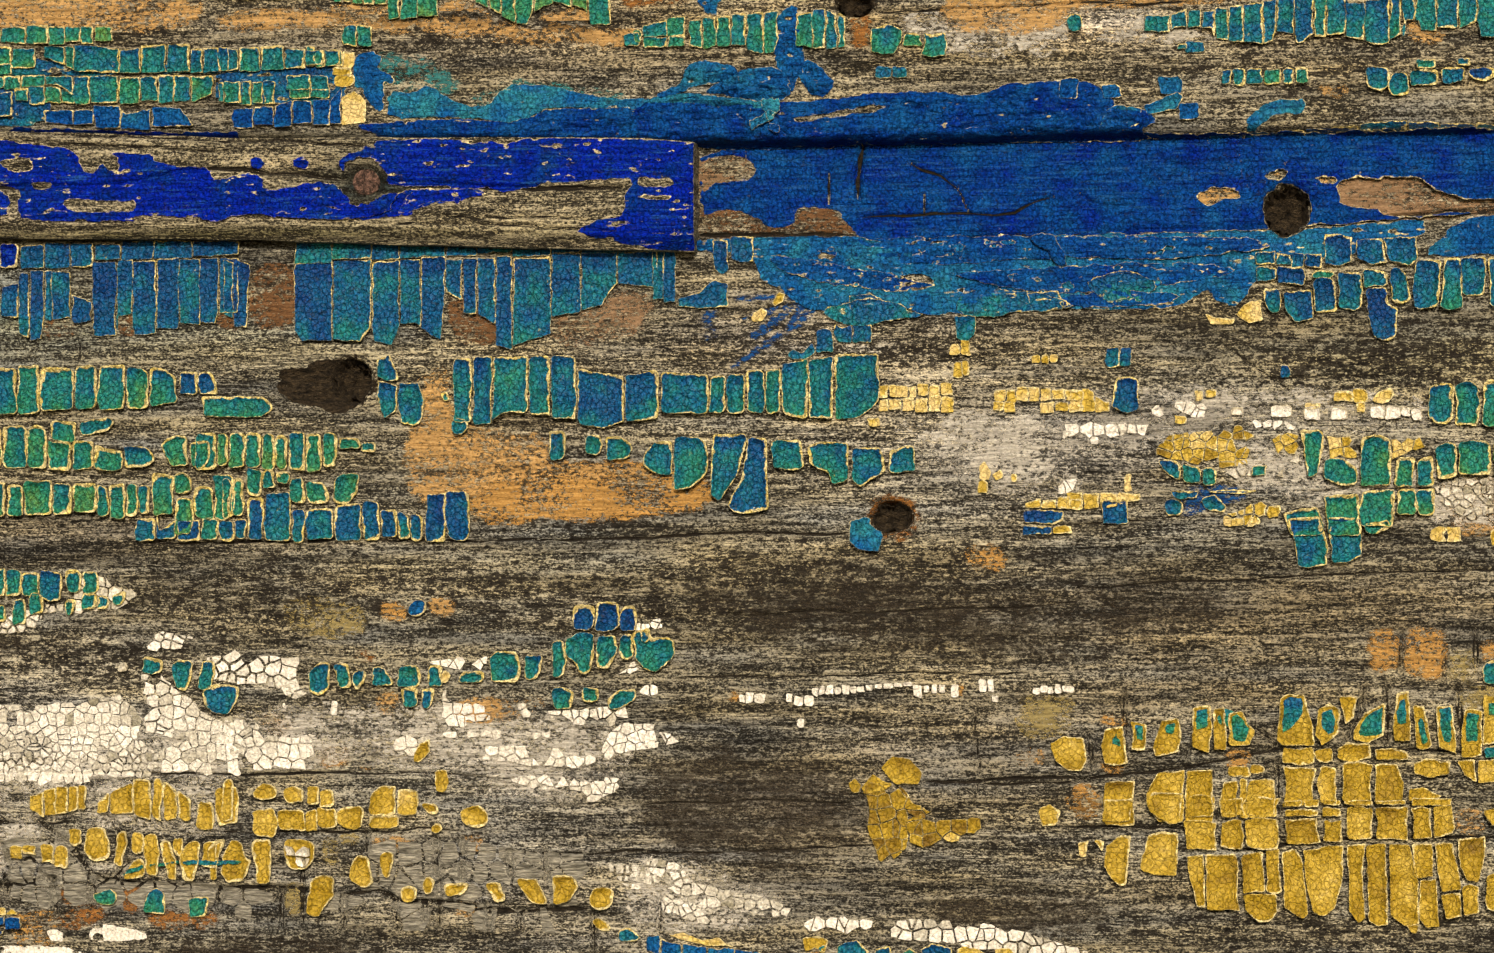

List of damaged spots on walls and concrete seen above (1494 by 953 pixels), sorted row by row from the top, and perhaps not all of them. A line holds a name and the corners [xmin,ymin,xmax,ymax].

peeling [0,0,1494,514]
peeling [0,364,470,543]
peeling [993,346,1494,568]
peeling [849,517,883,551]
peeling [0,568,137,634]
peeling [786,682,959,728]
peeling [978,679,999,702]
peeling [1033,684,1074,695]
peeling [0,599,791,953]
peeling [849,757,981,862]
peeling [1050,660,1494,933]
peeling [802,916,1088,953]